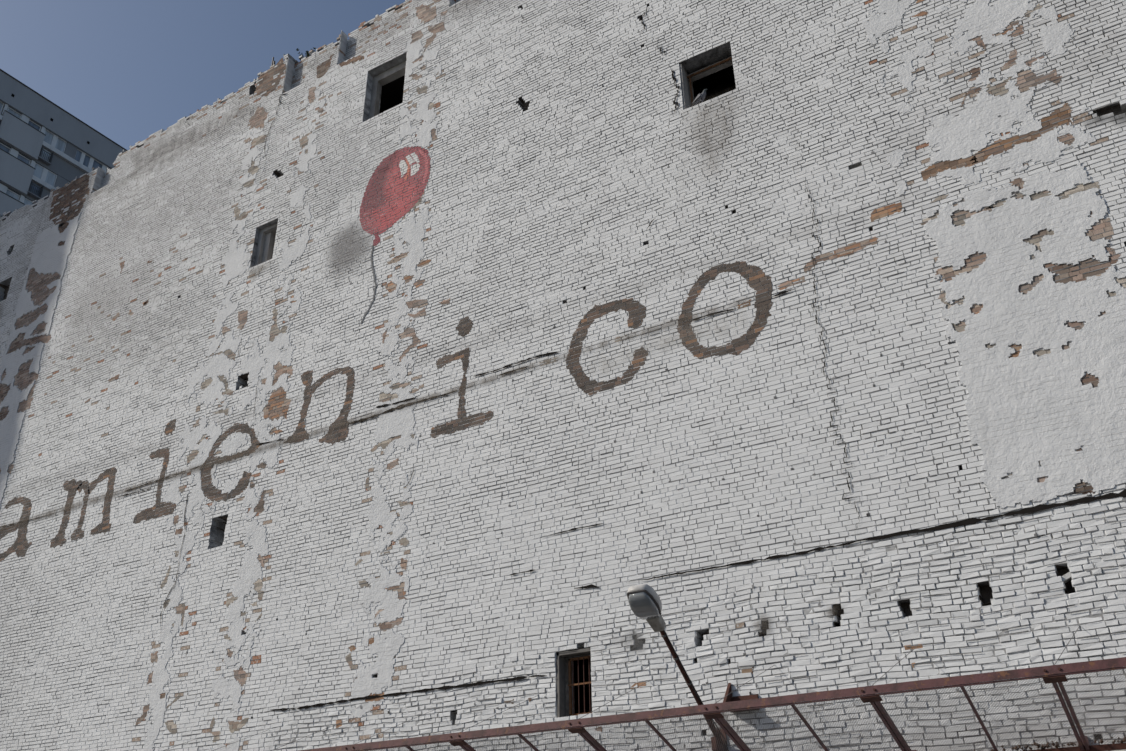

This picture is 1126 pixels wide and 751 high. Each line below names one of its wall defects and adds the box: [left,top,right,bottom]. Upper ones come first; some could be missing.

crack [638,9,680,112]
flaking render [960,3,1062,107]
flaking render [921,103,1075,181]
spalling [1093,104,1126,117]
flaking render [921,178,1100,226]
flaking render [934,252,986,332]
flaking render [1019,211,1126,297]
flaking render [0,269,61,421]
crack [803,178,860,528]
flaking render [985,322,1084,358]
flaking render [201,362,293,435]
crack [272,681,501,711]